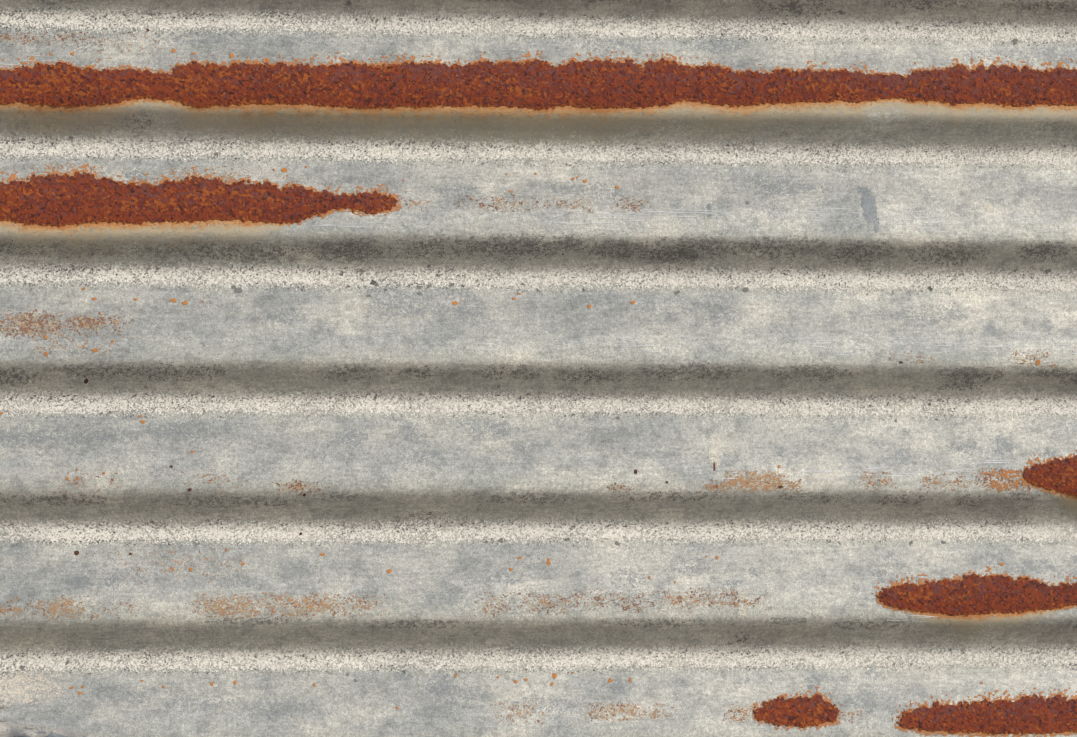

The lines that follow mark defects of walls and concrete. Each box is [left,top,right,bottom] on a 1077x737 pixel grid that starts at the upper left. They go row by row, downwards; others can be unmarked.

corrosion [0,28,1077,114]
corrosion [0,161,430,230]
corrosion [916,452,1077,499]
corrosion [872,562,1077,620]
corrosion [720,687,871,731]
corrosion [892,682,1077,737]